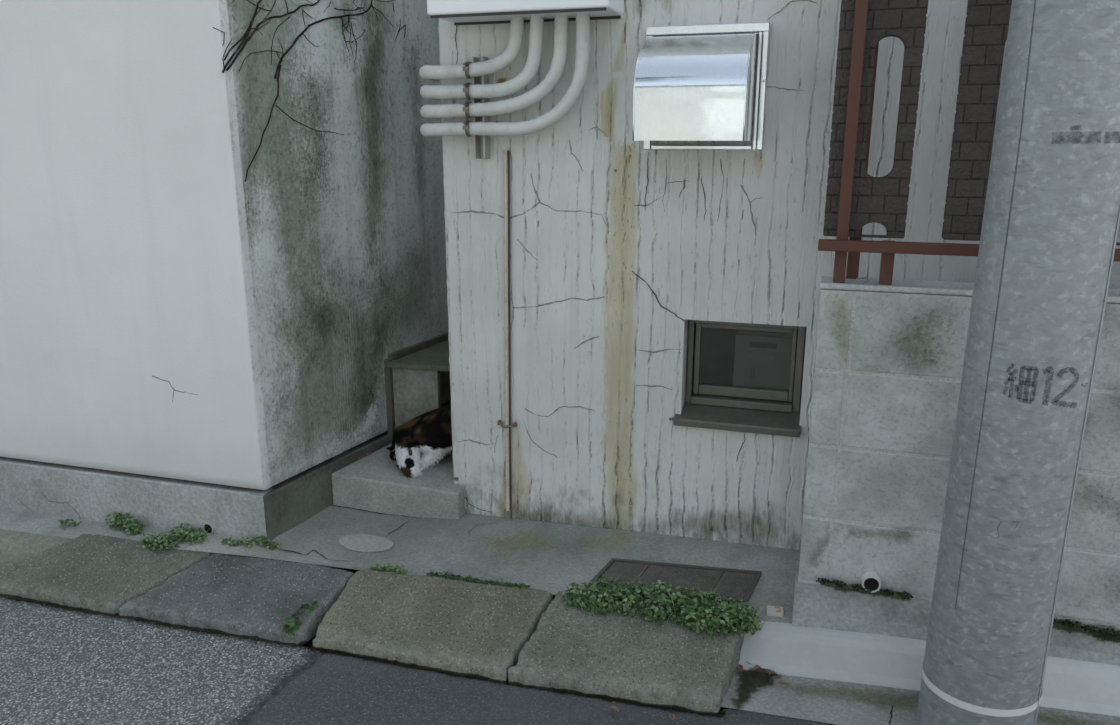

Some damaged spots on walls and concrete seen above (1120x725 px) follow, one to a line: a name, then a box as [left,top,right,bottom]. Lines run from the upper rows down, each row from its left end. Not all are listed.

crack [569,127,608,171]
crack [452,173,609,260]
crack [635,152,764,235]
crack [513,296,605,308]
crack [632,271,685,322]
crack [152,376,198,402]
leakage [359,379,380,435]
crack [460,435,498,453]
crack [525,406,594,458]